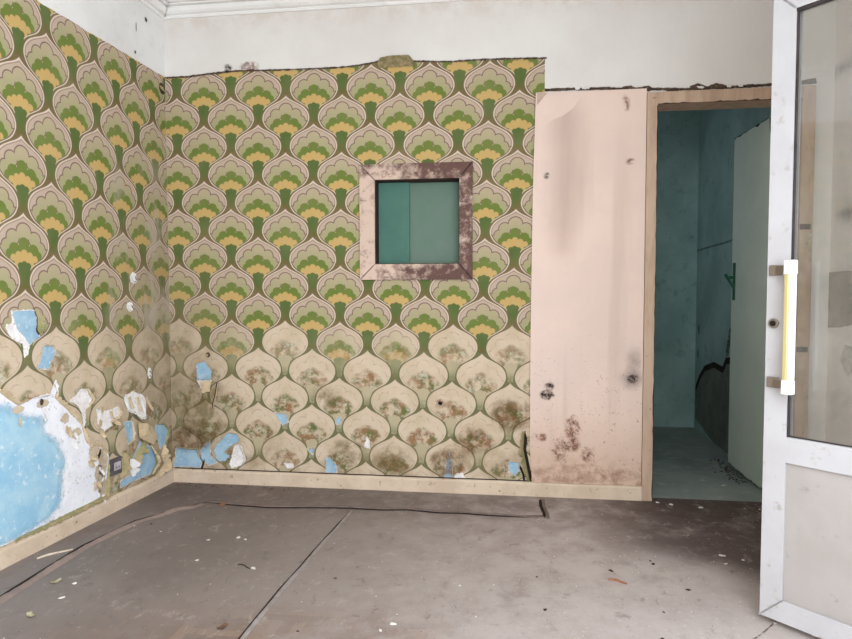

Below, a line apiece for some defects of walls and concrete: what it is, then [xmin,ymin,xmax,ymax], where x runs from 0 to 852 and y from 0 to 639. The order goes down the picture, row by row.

flaking render [828,268,852,328]
peeling [5,309,56,370]
peeling [196,352,212,393]
peeling [274,411,289,426]
water stain [496,402,524,429]
flaking render [695,329,731,454]
peeling [0,380,246,547]
peeling [325,456,338,473]
crack [519,431,532,482]
crack [0,499,550,639]